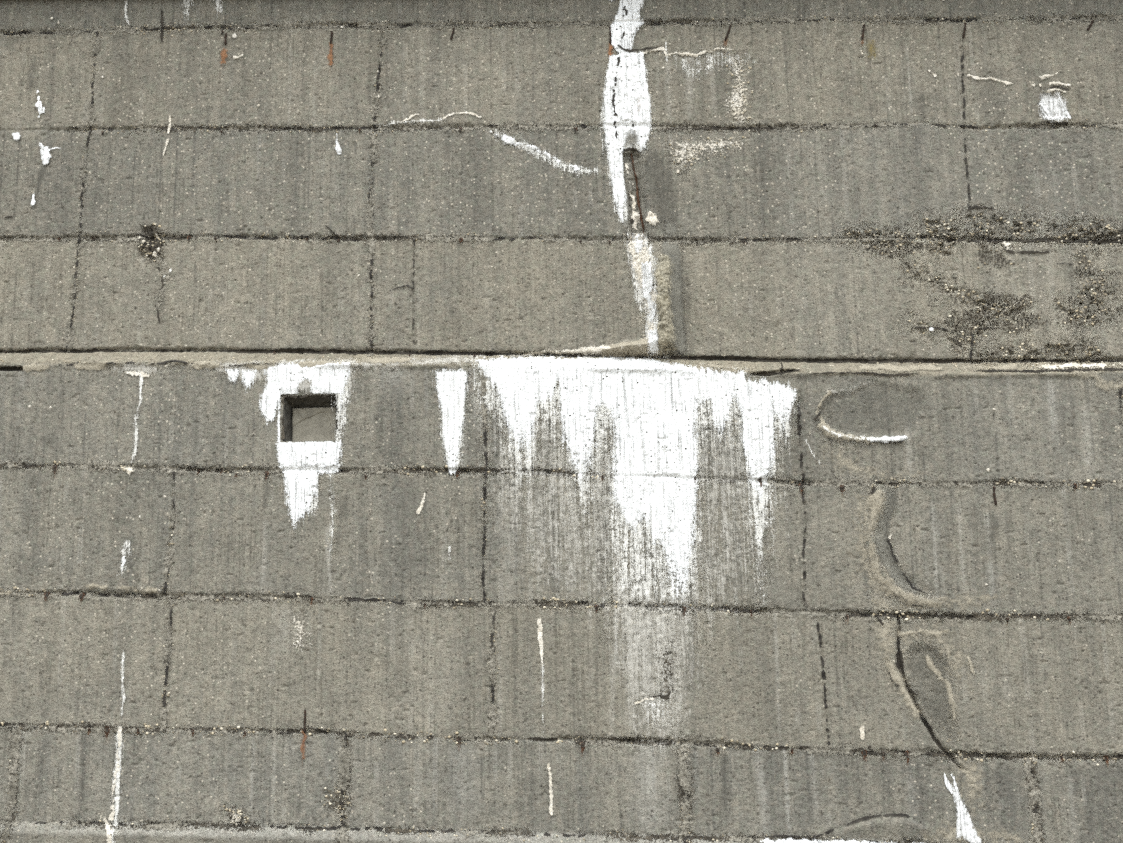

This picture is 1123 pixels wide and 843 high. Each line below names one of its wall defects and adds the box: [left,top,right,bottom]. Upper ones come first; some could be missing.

efflorescence [379,111,482,127]
spalling [372,120,587,136]
spalling [650,57,908,173]
spalling [5,222,304,262]
spalling [525,147,775,247]
spalling [796,206,1123,425]
water stain [225,361,393,556]
efflorescence [432,233,800,748]
crack [876,616,960,767]
water stain [920,757,1021,843]